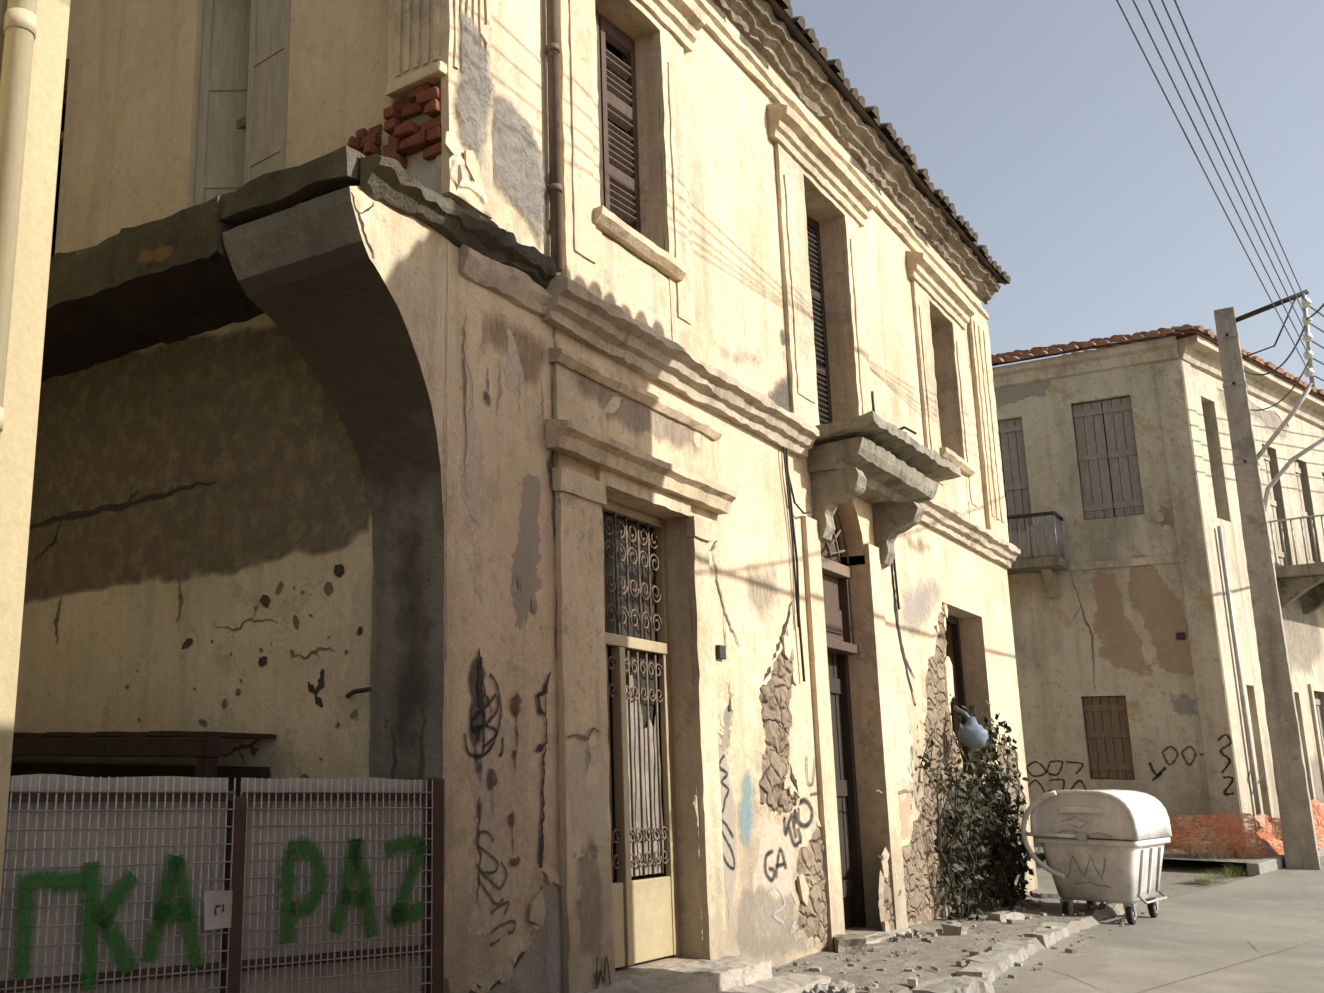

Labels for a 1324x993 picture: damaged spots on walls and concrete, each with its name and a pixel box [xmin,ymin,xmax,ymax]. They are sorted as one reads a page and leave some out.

flaking render [347,12,551,258]
crack [29,481,216,561]
crack [213,600,278,631]
crack [292,647,336,660]
peeling [511,475,542,629]
crack [710,540,740,661]
crack [892,562,916,706]
crack [1071,574,1096,689]
peeling [445,693,564,993]
flaking render [753,634,829,952]
flaking render [878,603,1028,932]